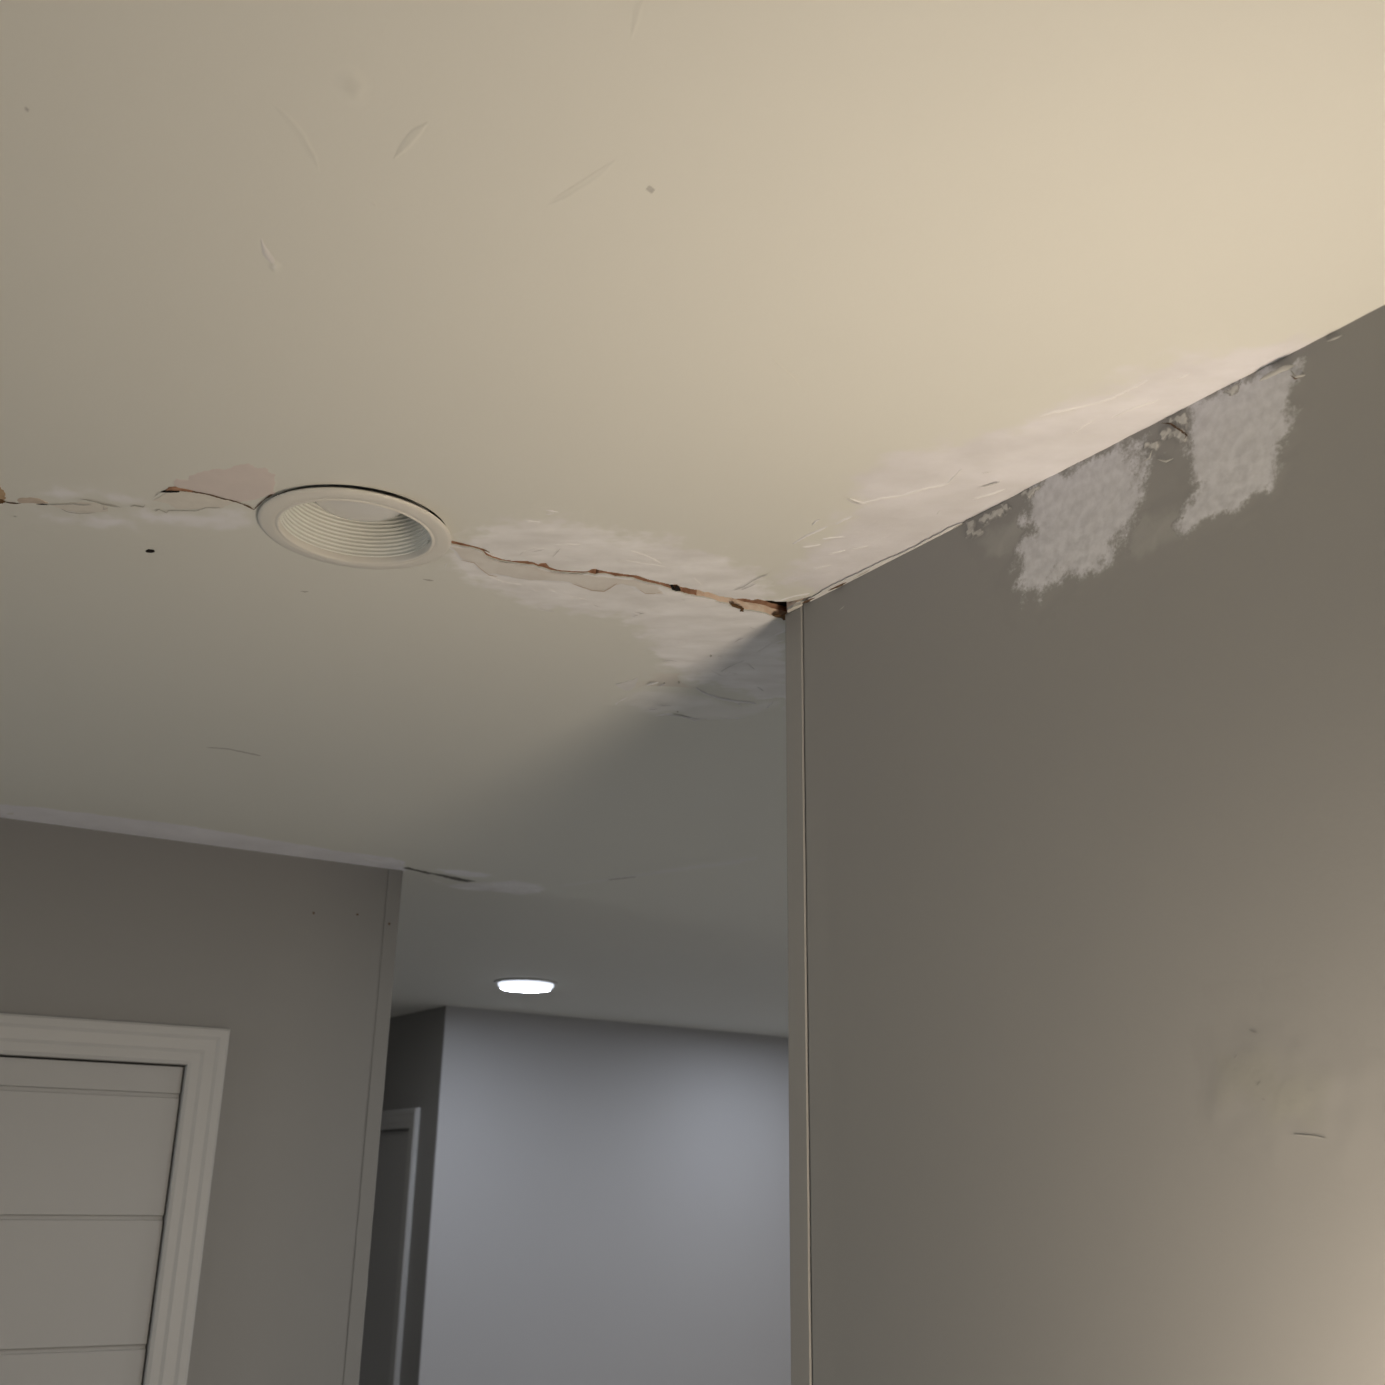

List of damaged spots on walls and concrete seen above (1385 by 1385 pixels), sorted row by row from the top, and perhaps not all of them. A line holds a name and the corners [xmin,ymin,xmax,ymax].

crack [451,523,964,620]